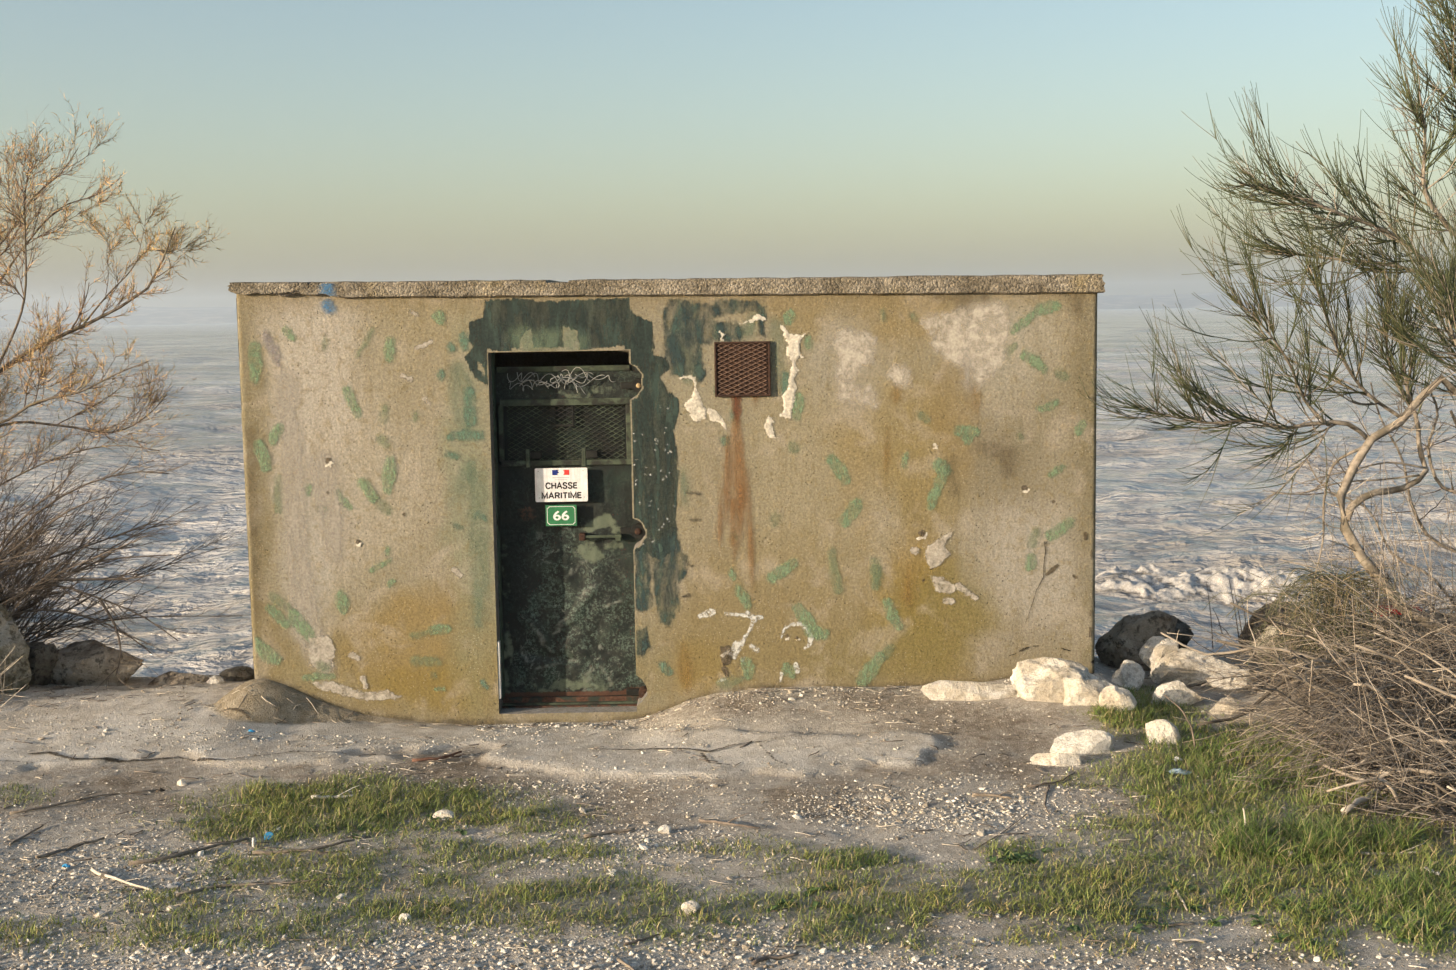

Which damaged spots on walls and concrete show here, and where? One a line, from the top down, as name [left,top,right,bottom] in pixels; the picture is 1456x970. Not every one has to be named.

peeling [679,375,727,430]
peeling [740,314,806,438]
corrosion [719,396,756,555]
peeling [910,530,979,605]
peeling [308,635,402,701]
spalling [720,645,733,678]